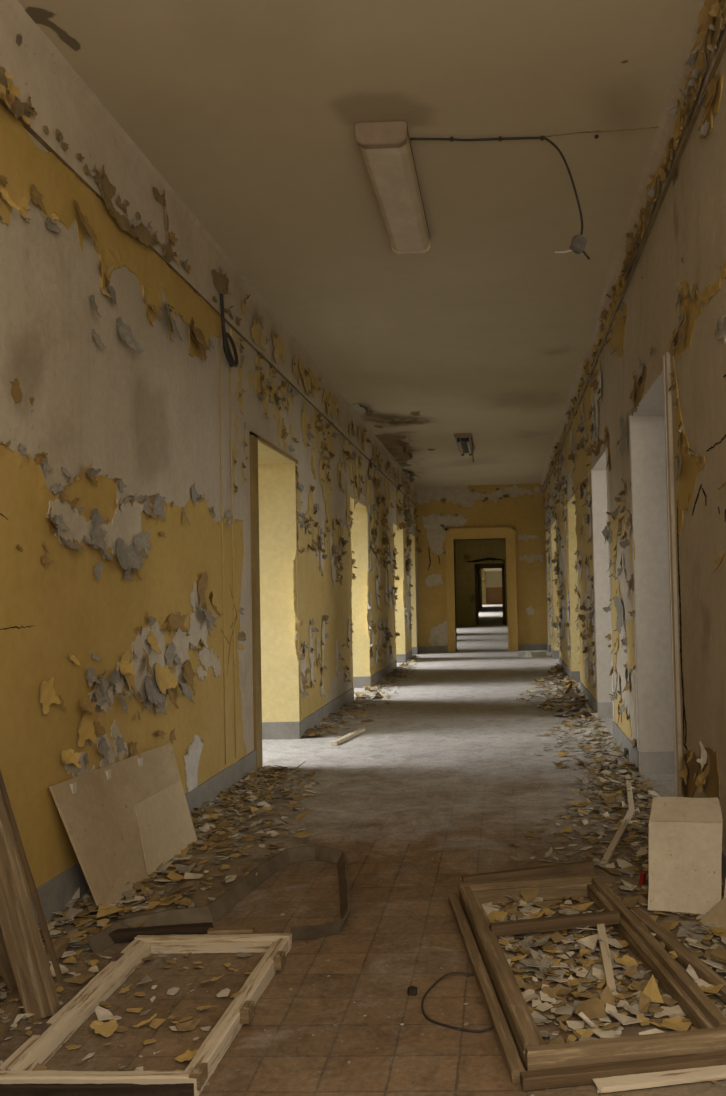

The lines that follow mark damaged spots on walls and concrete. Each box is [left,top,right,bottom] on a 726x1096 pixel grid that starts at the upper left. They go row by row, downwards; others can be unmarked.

peeling [0,0,726,758]
peeling [0,440,247,893]
peeling [679,741,721,799]
peeling [90,1019,118,1037]